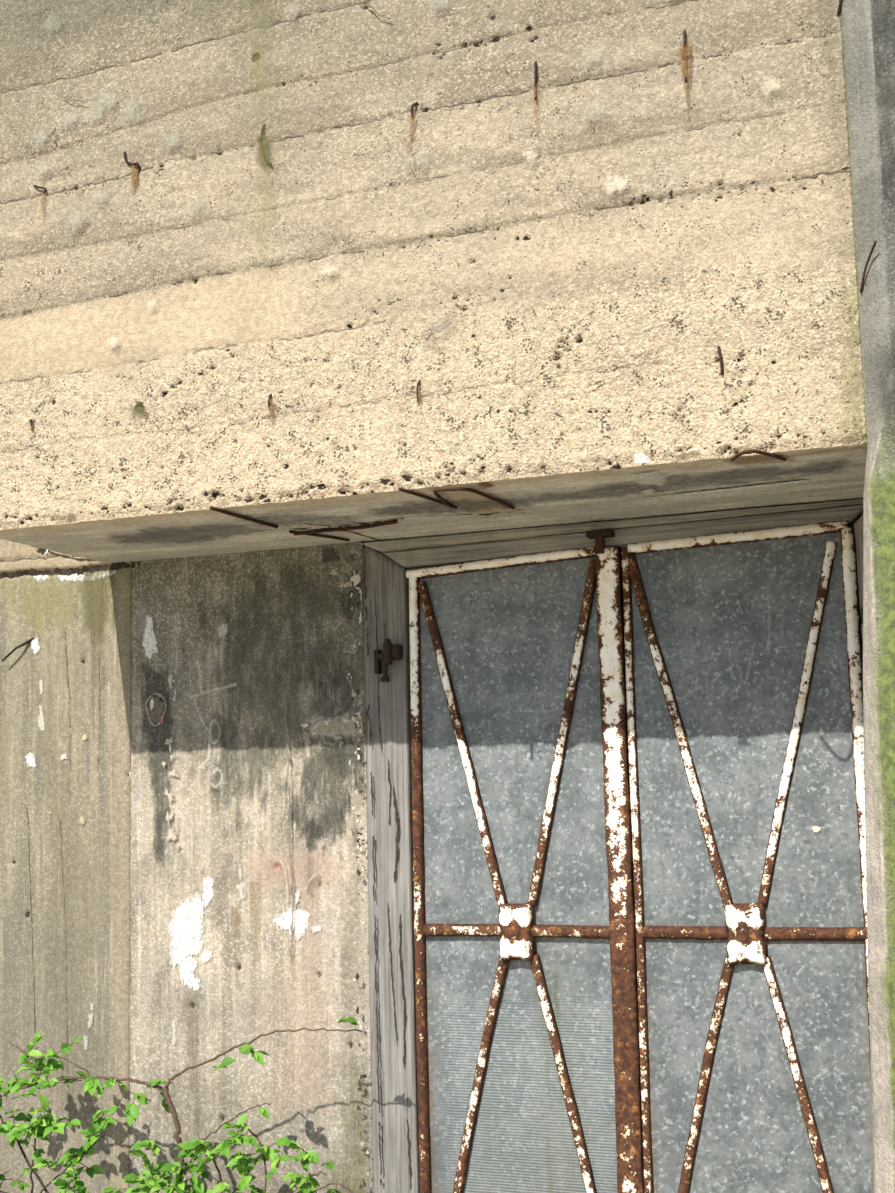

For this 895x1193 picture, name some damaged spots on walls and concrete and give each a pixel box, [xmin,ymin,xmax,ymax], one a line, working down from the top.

rust [679,43,691,117]
rust [131,165,139,193]
damp [141,615,172,867]
damp [210,570,364,941]
damp [169,878,214,991]